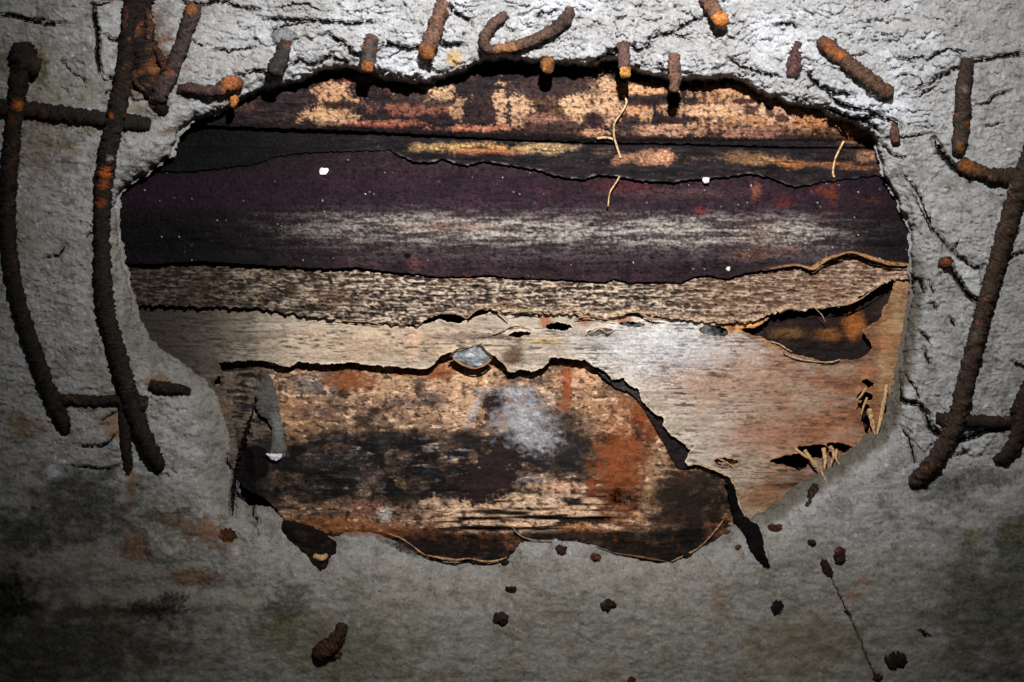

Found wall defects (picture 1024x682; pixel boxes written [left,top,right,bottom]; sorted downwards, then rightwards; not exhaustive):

rust [120,0,171,100]
rust [230,94,239,109]
crack [180,0,474,76]
crack [590,14,707,63]
crack [893,47,1024,98]
crack [729,58,1024,325]
spalling [148,0,1024,488]
damp [276,388,590,506]
crack [899,331,998,489]
crack [832,580,875,675]